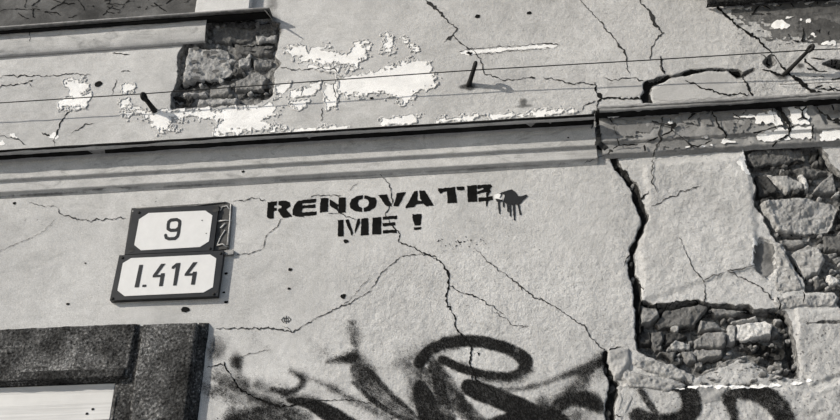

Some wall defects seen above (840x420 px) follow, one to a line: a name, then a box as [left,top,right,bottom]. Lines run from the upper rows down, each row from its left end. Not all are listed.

spalling [724,1,840,46]
peeling [460,44,557,55]
crack [0,73,90,87]
flaking render [117,20,442,137]
spalling [604,73,749,102]
crack [42,111,92,144]
peeling [435,105,578,123]
peeling [604,116,658,141]
crack [426,0,840,334]
flaking render [621,107,840,403]
crack [474,248,622,420]